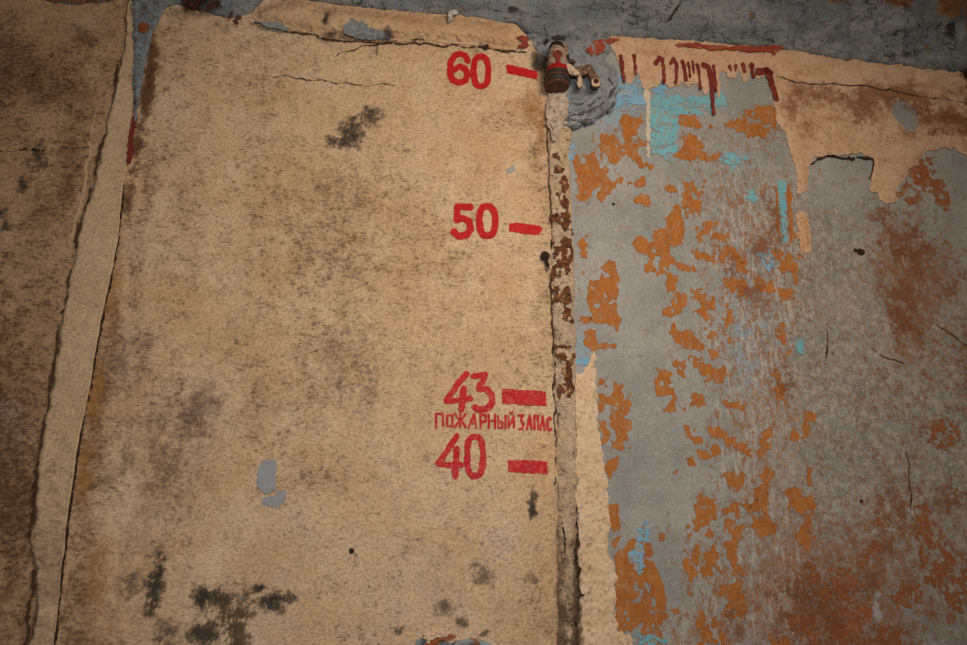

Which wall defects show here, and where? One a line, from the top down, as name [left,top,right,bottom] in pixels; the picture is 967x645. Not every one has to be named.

crack [262,75,396,86]
flaking render [344,18,391,41]
crack [285,31,527,56]
water stain [326,106,380,148]
rust [753,197,786,260]
crack [0,64,119,540]
flaking render [546,36,967,645]
rust [869,206,932,339]
crack [54,185,124,645]
crack [23,567,37,645]
water stain [124,546,297,645]